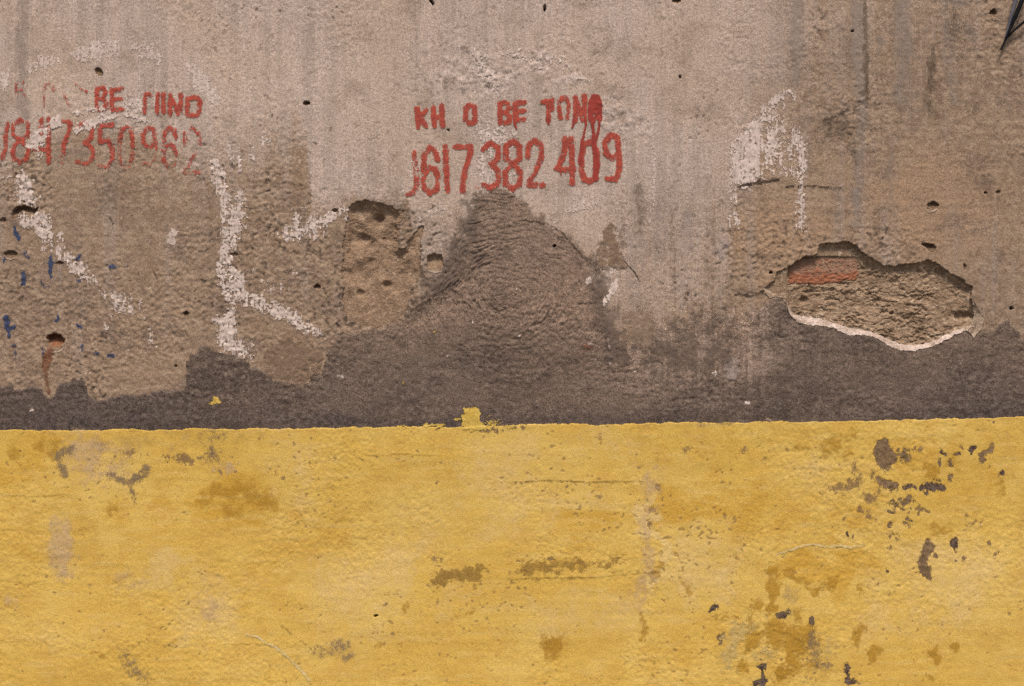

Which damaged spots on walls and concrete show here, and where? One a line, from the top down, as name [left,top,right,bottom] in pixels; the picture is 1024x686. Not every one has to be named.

water stain [40,222,64,252]
water stain [223,215,247,252]
spalling [332,200,444,328]
spalling [763,242,984,351]
corrosion [42,348,54,394]
peeling [820,438,1005,549]
peeling [917,539,938,581]
peeling [950,514,983,562]